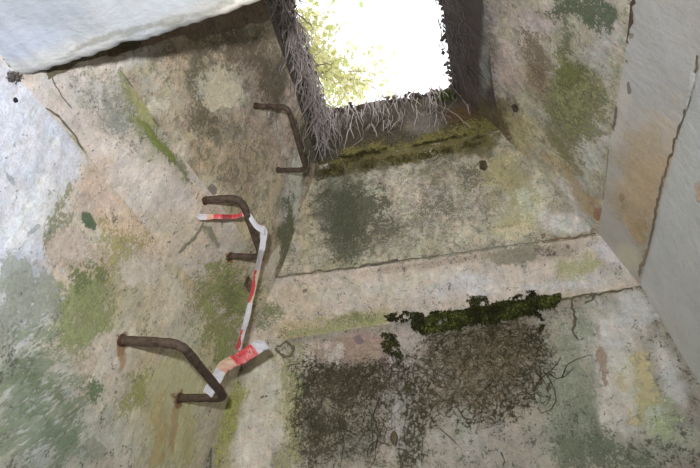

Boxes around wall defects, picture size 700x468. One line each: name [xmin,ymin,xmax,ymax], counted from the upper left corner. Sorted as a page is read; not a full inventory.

crack [626,0,635,44]
leakage [295,120,405,267]
crack [561,55,698,340]
rust [117,333,127,370]